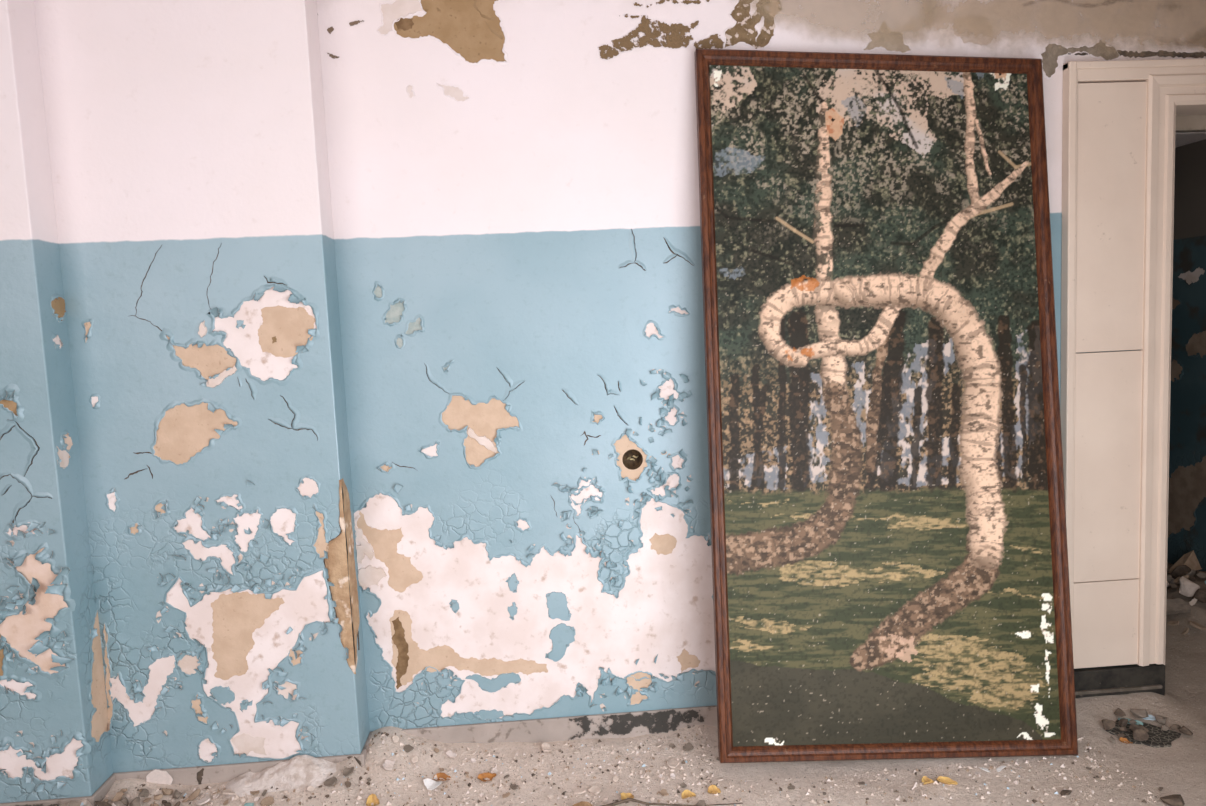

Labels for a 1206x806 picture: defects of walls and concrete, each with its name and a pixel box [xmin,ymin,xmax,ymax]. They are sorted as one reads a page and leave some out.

spalling [376,0,509,66]
leakage [924,0,1206,48]
crack [130,245,162,331]
peeling [150,283,320,466]
crack [0,420,53,526]
peeling [1168,454,1206,538]
peeling [0,369,716,792]